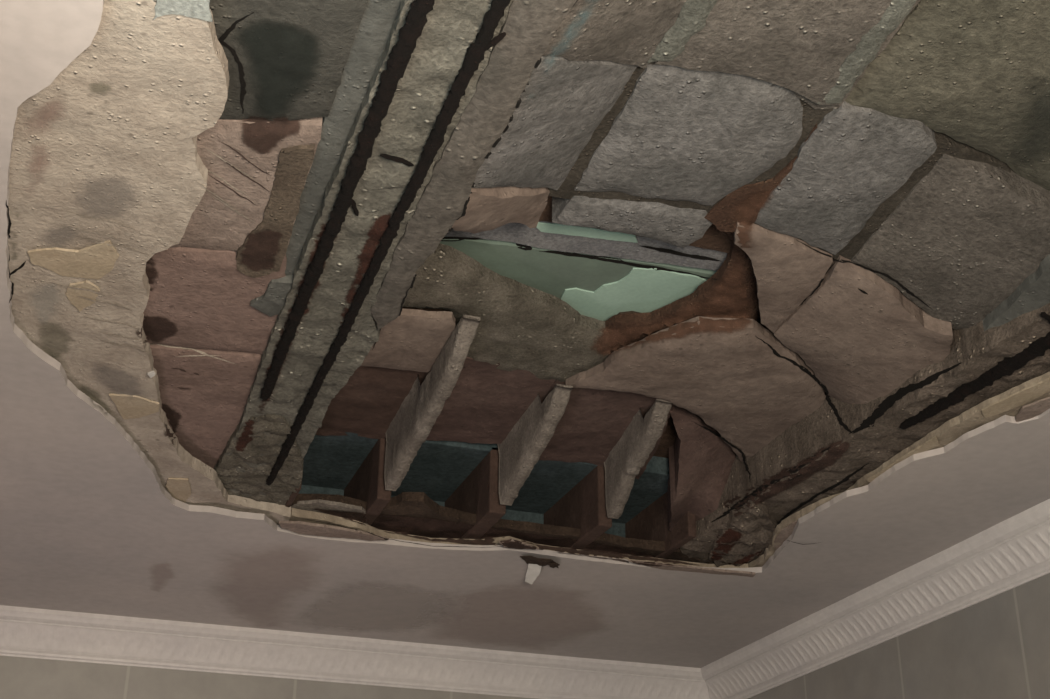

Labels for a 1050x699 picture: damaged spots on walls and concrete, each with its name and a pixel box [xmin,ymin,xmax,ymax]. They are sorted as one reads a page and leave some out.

crack [218,12,254,112]
leakage [240,23,317,154]
flaking render [8,0,578,584]
crack [797,240,930,308]
flaking render [589,332,1050,577]